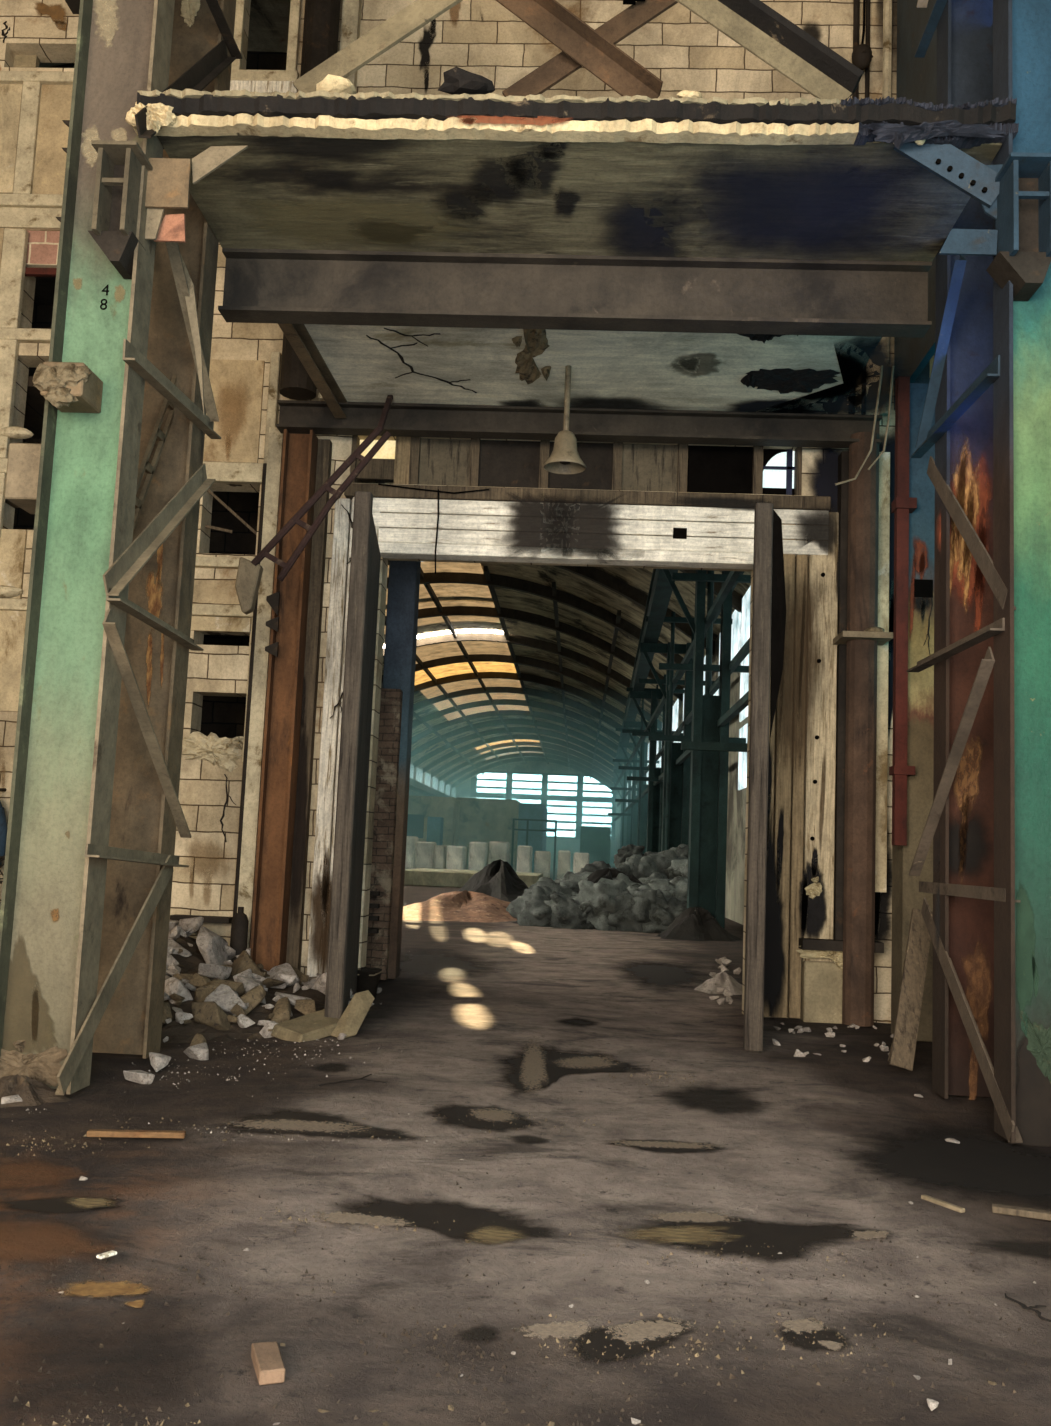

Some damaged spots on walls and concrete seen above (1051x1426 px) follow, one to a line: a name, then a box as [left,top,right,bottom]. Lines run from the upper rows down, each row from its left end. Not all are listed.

peeling [95,0,116,46]
water stain [538,142,567,157]
water stain [555,189,580,215]
water stain [608,195,681,257]
crack [366,328,477,393]
spalling [512,329,551,384]
corrosion [909,446,991,639]
corrosion [954,739,983,872]